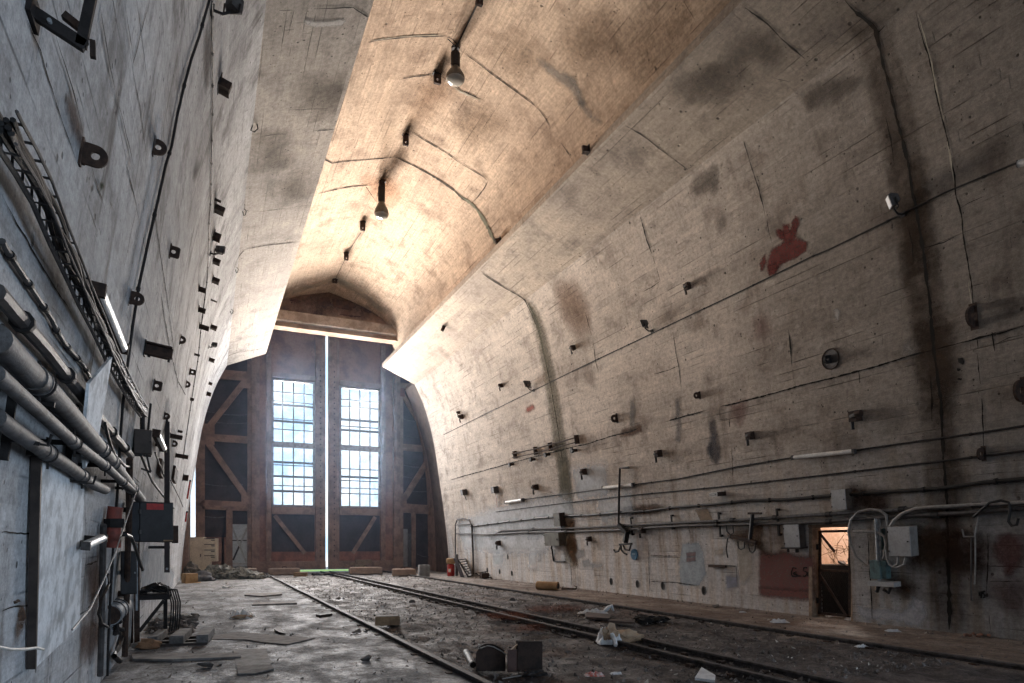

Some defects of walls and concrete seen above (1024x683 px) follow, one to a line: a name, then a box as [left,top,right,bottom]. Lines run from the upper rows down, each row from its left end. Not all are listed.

crack [320,7,571,158]
leakage [804,80,855,108]
crack [259,134,495,244]
crack [483,273,534,320]
crack [666,0,1023,629]
leakage [880,101,960,536]
crack [452,429,636,480]
leakage [531,309,572,520]
leakage [707,420,719,463]